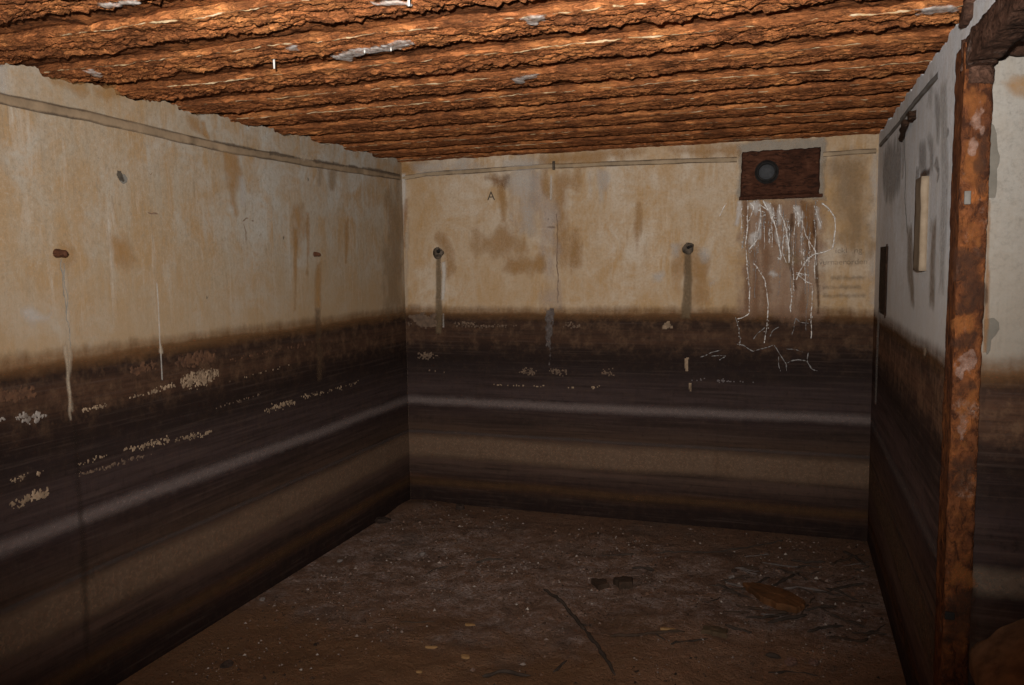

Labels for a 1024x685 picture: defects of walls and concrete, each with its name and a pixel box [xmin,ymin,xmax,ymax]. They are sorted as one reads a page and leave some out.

damp [0,175,945,685]